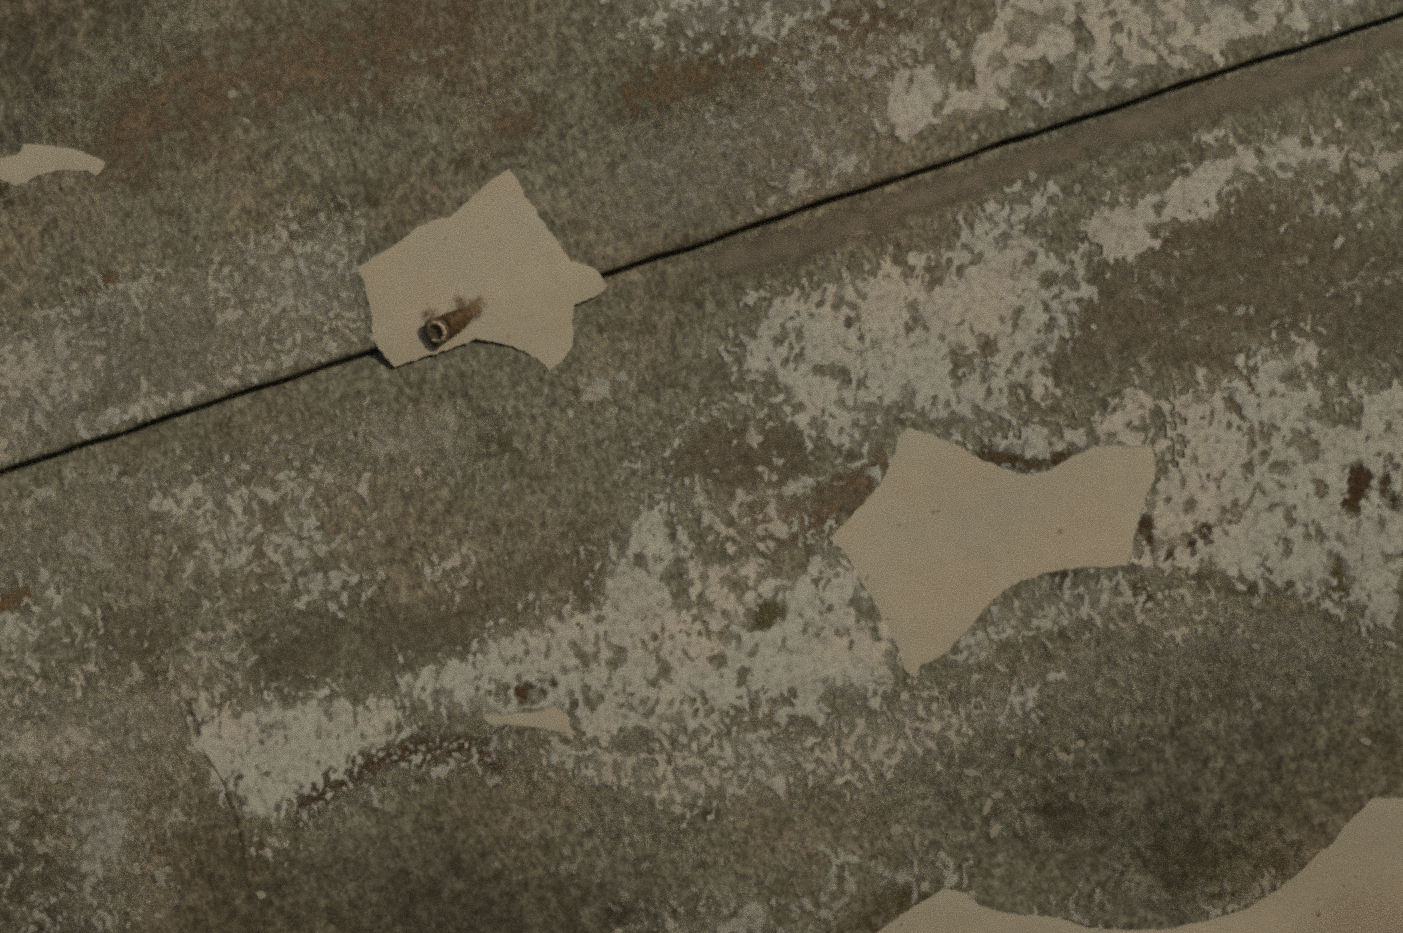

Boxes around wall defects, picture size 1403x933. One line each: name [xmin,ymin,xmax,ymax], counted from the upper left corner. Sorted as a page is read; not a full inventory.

peeling [0,144,105,186]
peeling [599,0,1355,222]
peeling [1343,66,1399,132]
peeling [0,168,606,463]
peeling [137,116,1403,861]
corrosion [1340,466,1397,516]
peeling [0,465,159,933]
peeling [614,798,1403,933]